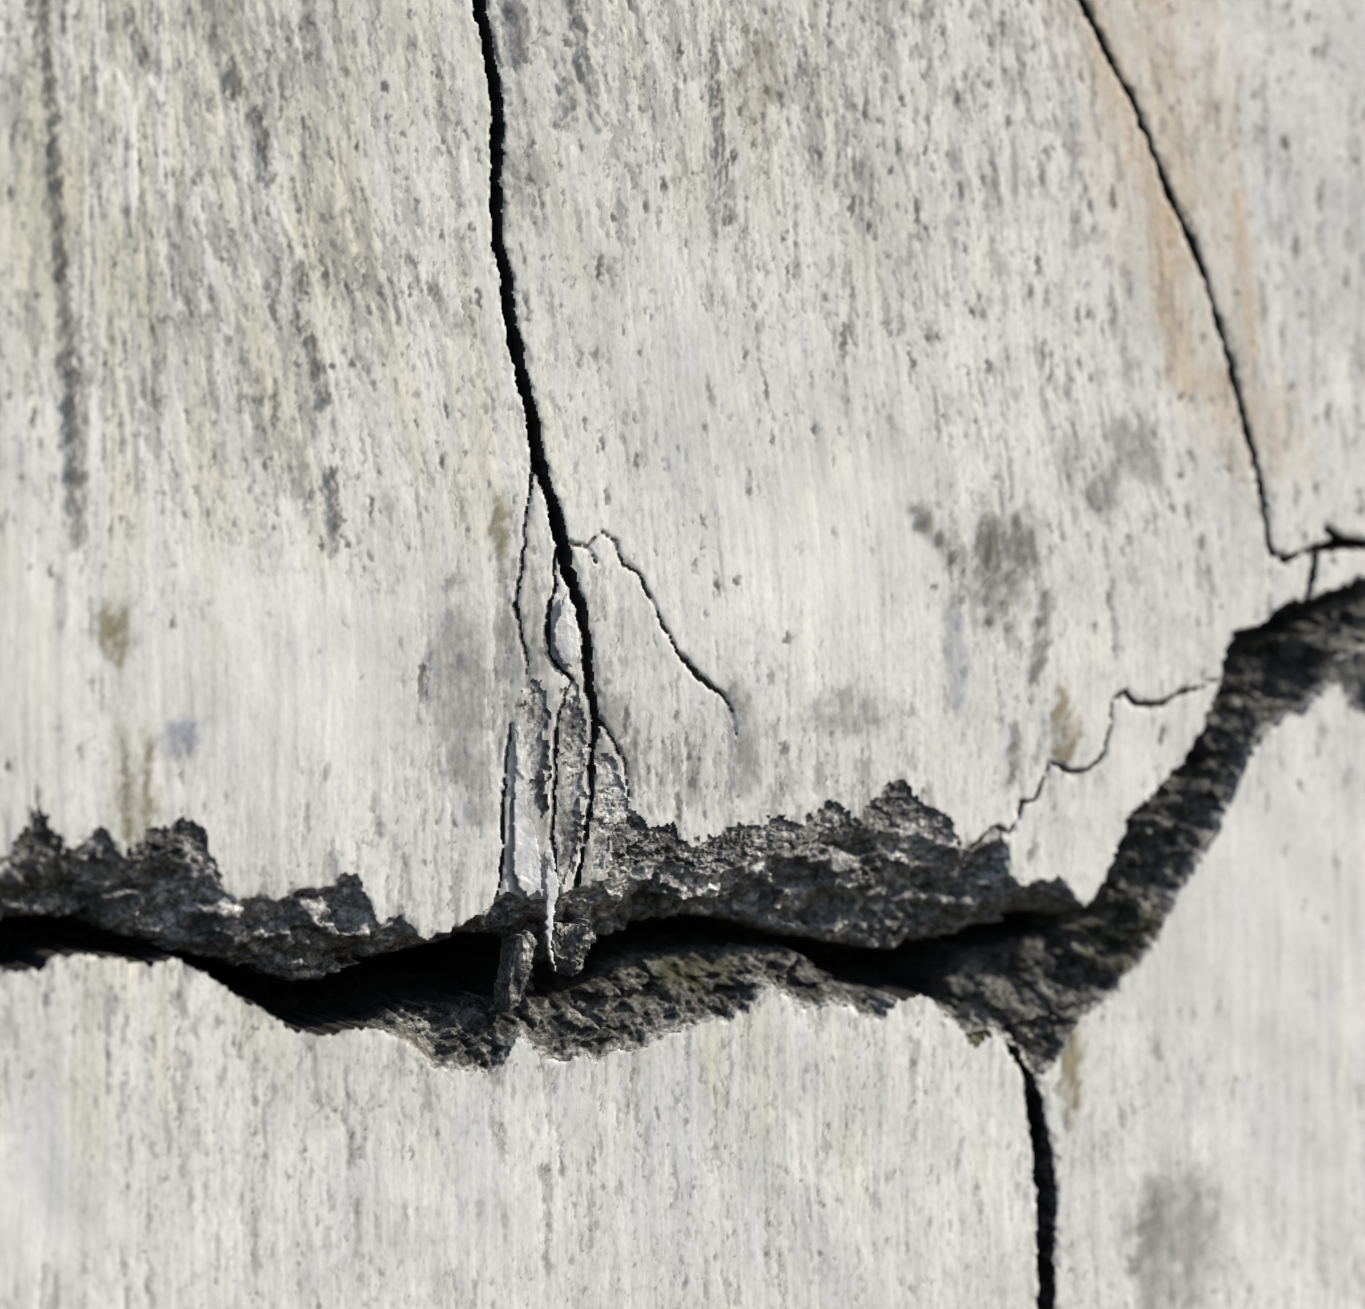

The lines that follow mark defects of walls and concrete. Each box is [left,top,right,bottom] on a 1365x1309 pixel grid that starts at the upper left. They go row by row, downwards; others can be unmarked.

crack [472,0,630,888]
crack [601,531,652,599]
crack [1077,0,1365,601]
crack [0,575,1365,1076]
crack [1006,1042,1058,1309]